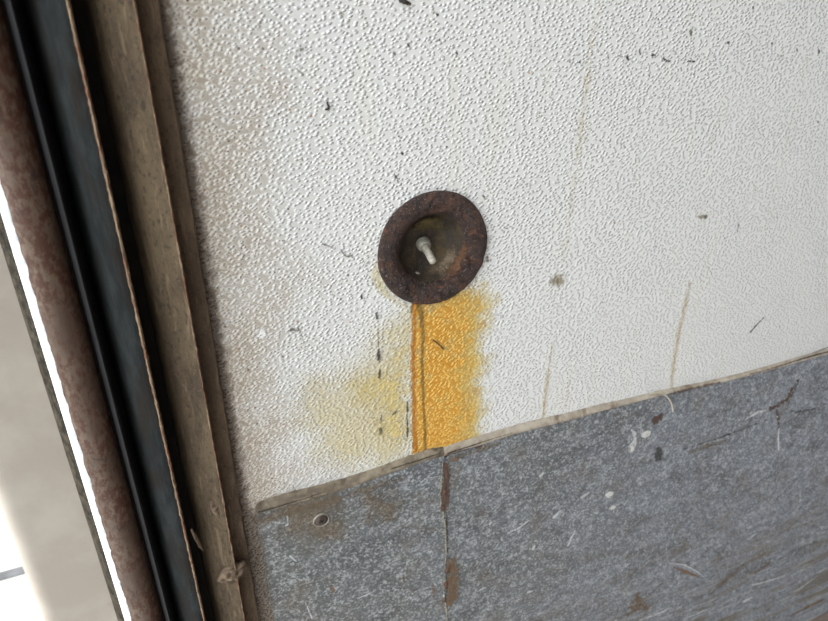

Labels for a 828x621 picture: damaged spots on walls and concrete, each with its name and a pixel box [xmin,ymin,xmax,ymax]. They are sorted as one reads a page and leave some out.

corrosion [66,0,206,621]
corrosion [410,290,492,455]